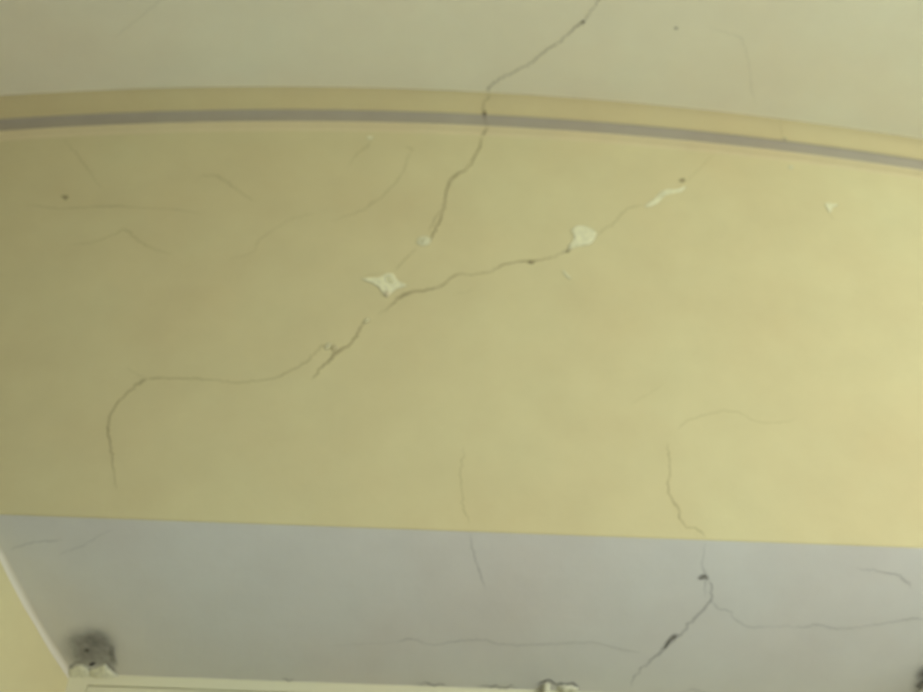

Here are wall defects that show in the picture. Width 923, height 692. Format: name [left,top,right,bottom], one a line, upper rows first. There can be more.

peeling [561,225,596,253]
peeling [362,273,406,297]